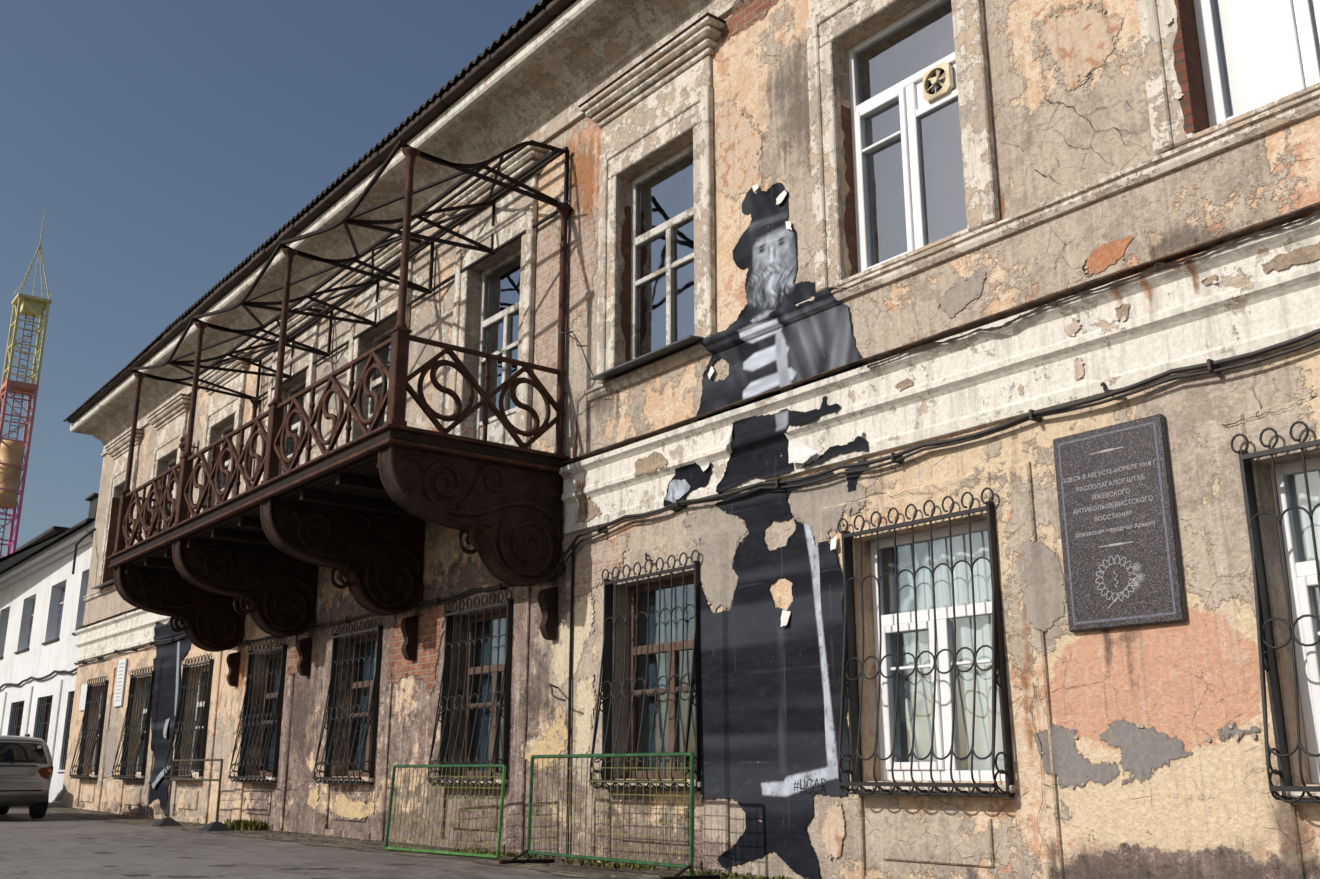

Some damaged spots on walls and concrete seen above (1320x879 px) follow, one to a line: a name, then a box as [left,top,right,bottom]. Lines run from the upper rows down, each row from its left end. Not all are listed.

flaking render [721,0,778,42]
spalling [1037,0,1124,92]
flaking render [1163,0,1210,134]
spalling [713,91,764,202]
peeling [937,269,986,318]
spalling [1082,236,1134,277]
flaking render [386,602,447,694]
spalling [520,593,597,773]
peeling [1033,718,1261,791]